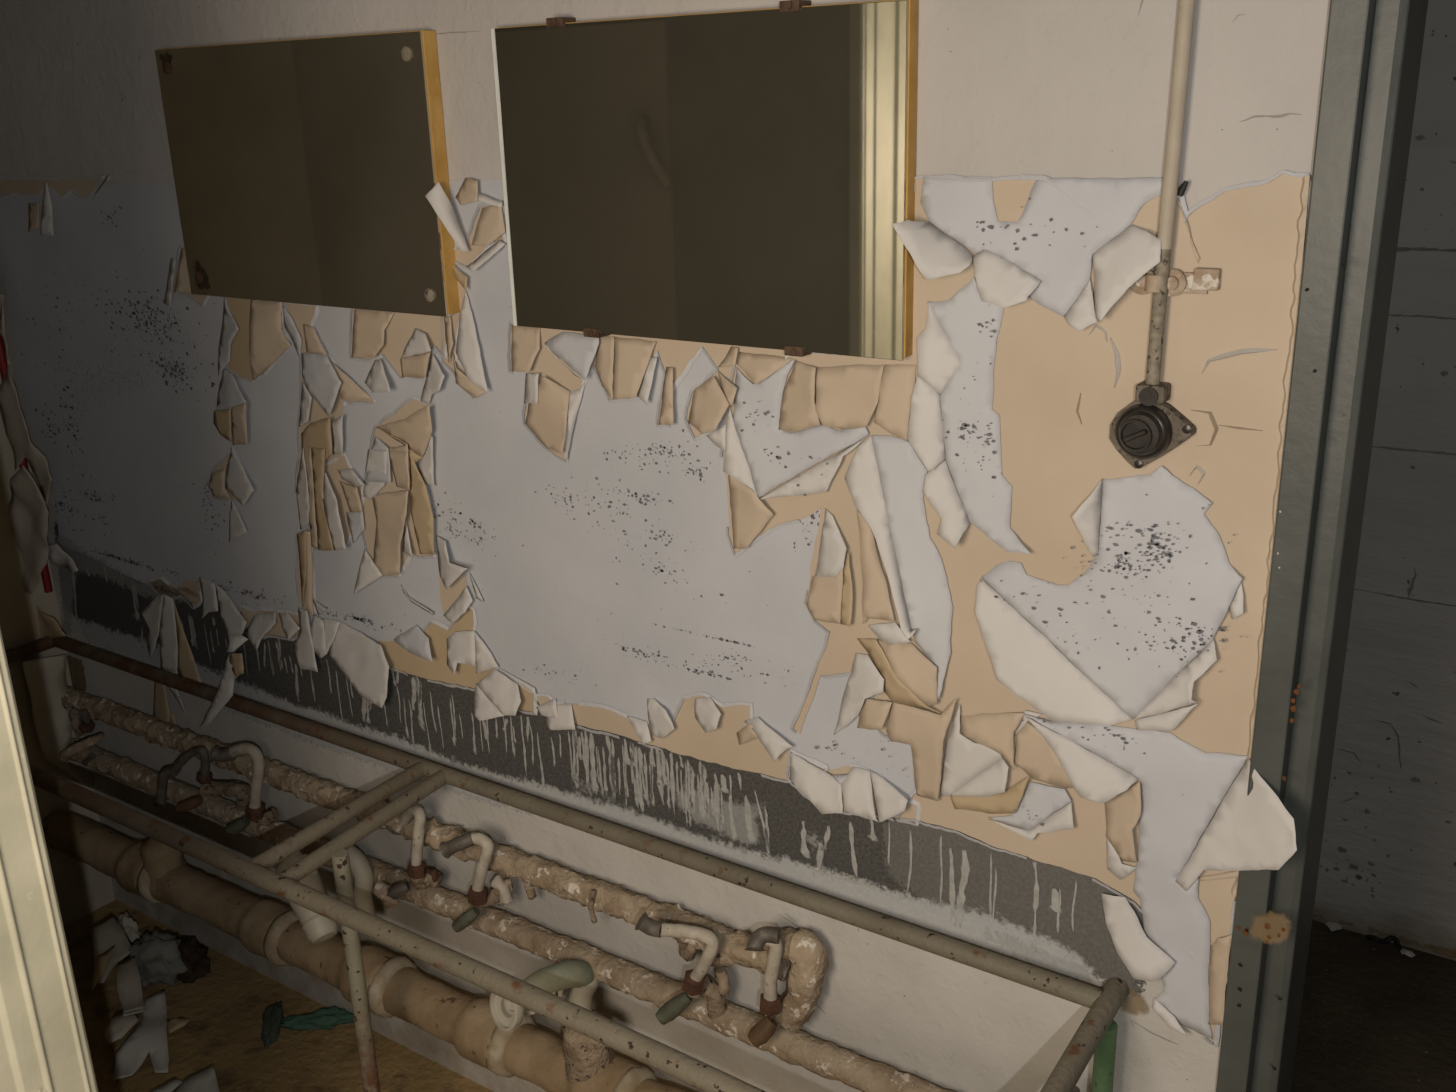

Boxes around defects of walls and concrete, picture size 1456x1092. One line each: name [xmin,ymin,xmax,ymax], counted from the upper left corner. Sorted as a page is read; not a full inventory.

peeling [0,173,110,236]
peeling [0,294,89,787]
leakage [66,656,86,691]
leakage [27,266,286,676]
leakage [327,607,401,632]
leakage [430,491,496,556]
leakage [534,429,724,597]
peeling [141,170,1311,1048]
leakage [942,362,996,479]
leakage [182,616,1093,977]